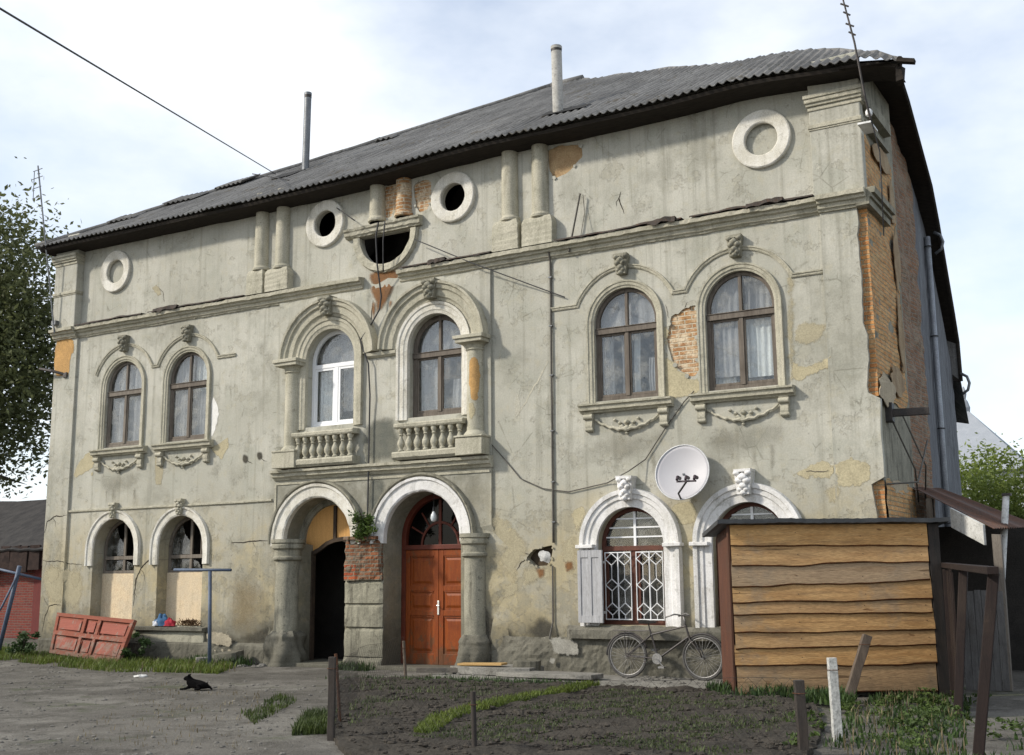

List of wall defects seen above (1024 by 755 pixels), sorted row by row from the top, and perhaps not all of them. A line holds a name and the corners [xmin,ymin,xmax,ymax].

spalling [547,144,583,180]
spalling [385,184,396,218]
spalling [414,180,431,212]
spalling [858,134,908,408]
peeling [54,339,74,376]
spalling [469,357,481,419]
spalling [664,303,699,398]
spalling [793,457,917,518]
spalling [516,506,585,584]